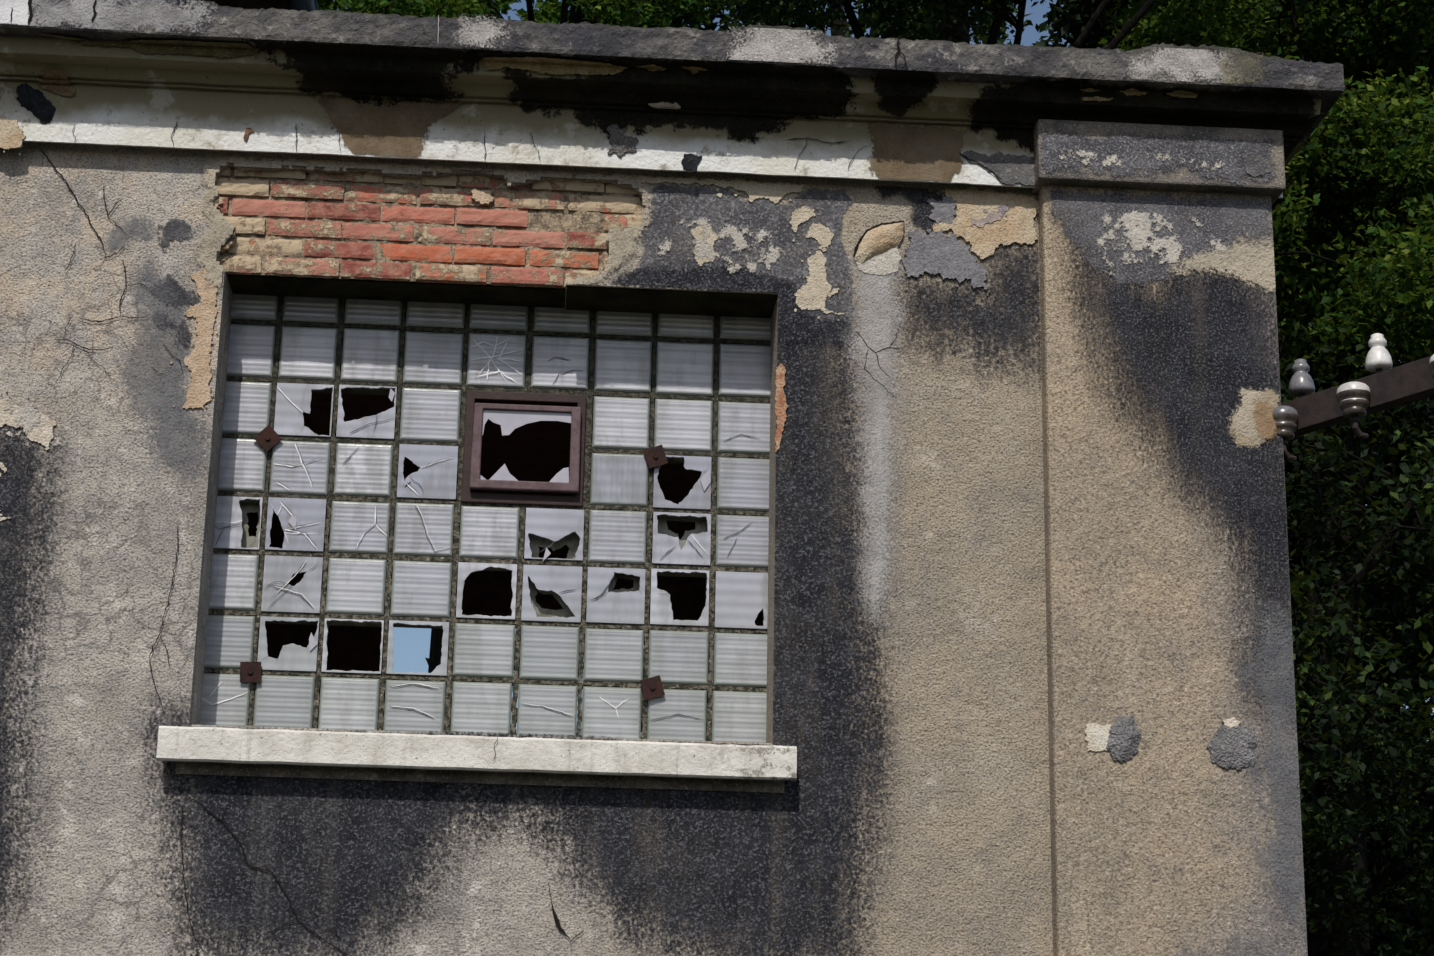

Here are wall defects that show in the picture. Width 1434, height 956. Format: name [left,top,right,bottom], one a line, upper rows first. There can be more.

spalling [0,69,77,155]
crack [40,124,150,379]
flaking render [170,124,845,410]
peeling [893,150,1039,296]
peeling [1097,211,1276,292]
peeling [0,390,61,451]
spalling [774,364,788,453]
leakage [141,39,1319,956]
leakage [0,424,64,942]
peeling [1085,723,1112,752]
peeling [1221,717,1241,727]